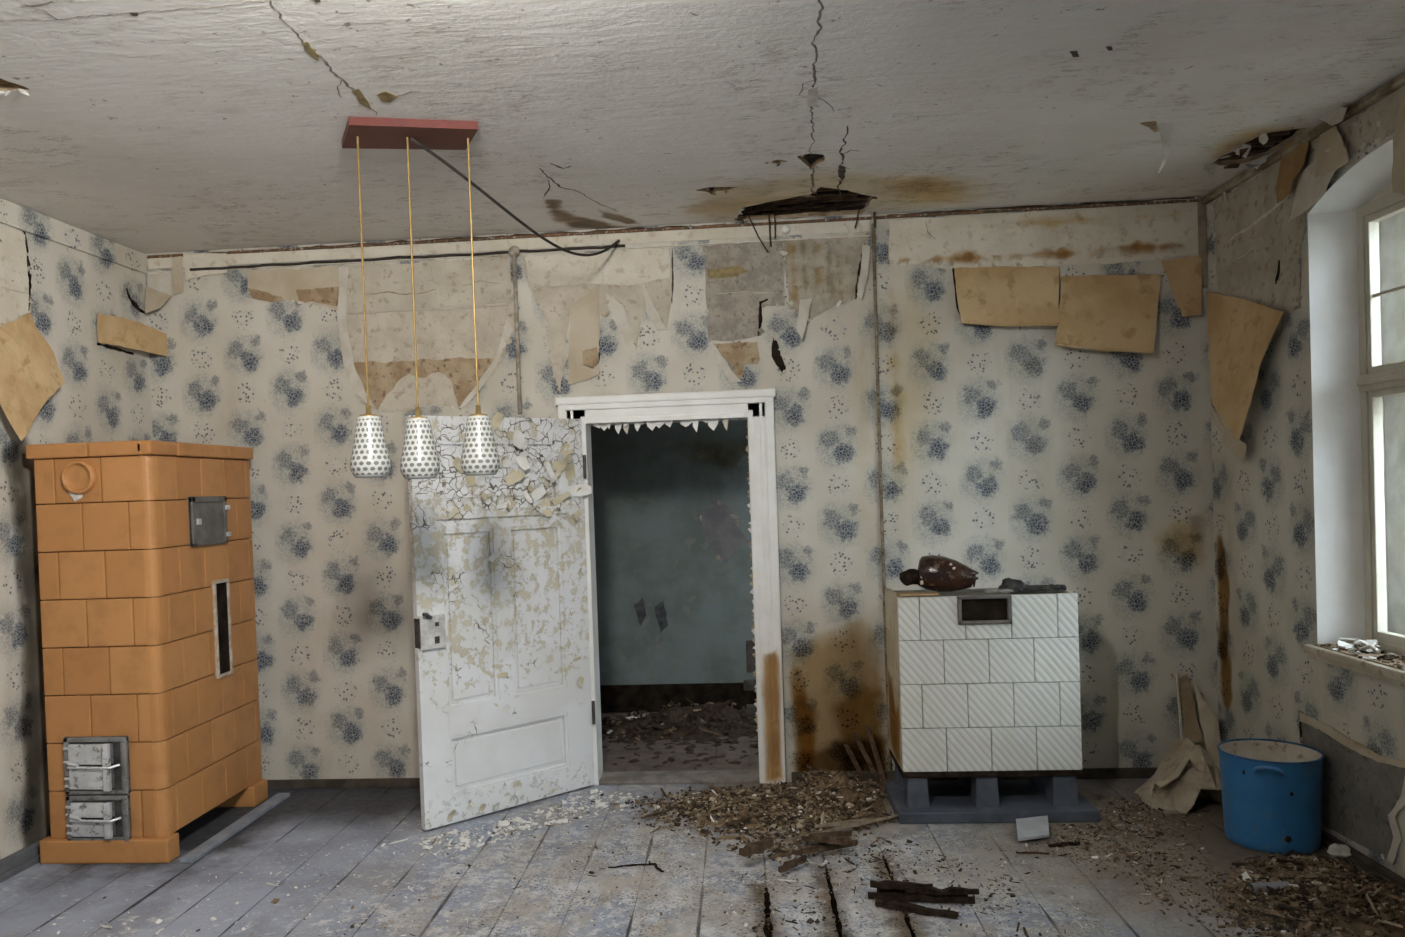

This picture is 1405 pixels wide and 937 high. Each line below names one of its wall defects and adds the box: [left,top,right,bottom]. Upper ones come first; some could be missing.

flaking render [0,78,29,96]
crack [0,1,418,115]
crack [799,0,857,197]
crack [148,163,726,259]
spalling [757,328,786,373]
leakage [804,742,884,771]